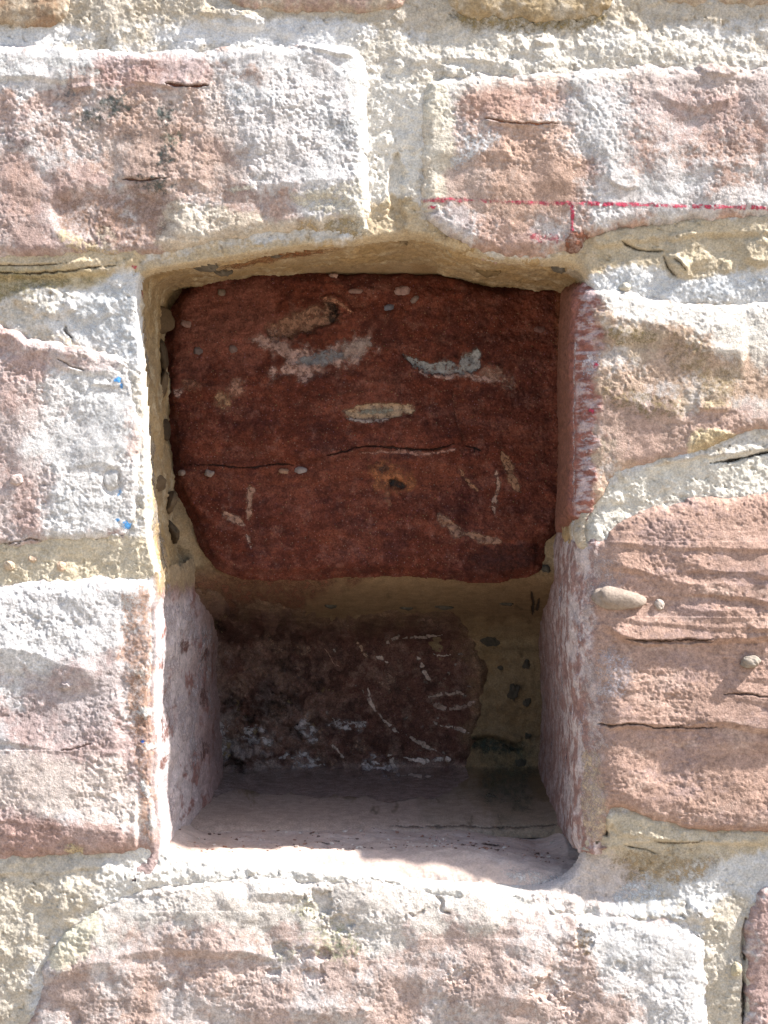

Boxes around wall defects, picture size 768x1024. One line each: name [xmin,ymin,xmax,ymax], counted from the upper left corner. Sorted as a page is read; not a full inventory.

crack [166,81,208,89]
crack [486,117,558,125]
crack [327,395,481,456]
crack [720,452,768,463]
crack [191,461,291,469]
crack [635,636,708,644]